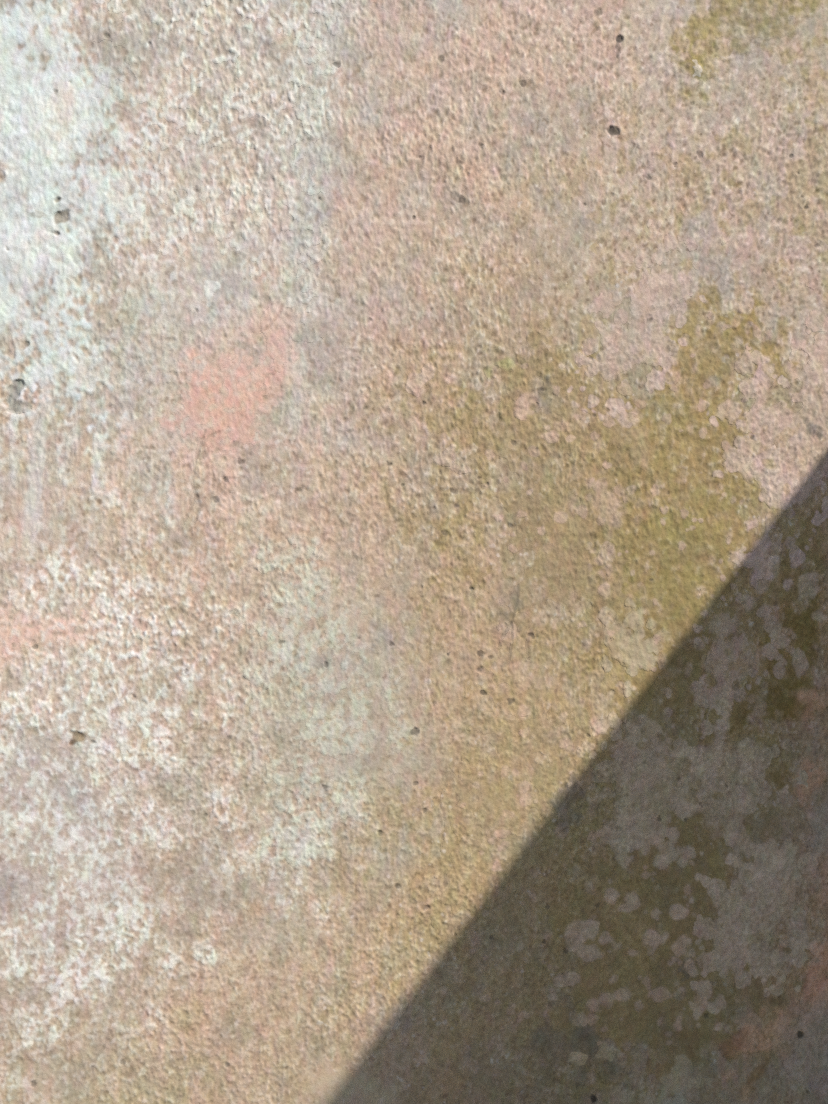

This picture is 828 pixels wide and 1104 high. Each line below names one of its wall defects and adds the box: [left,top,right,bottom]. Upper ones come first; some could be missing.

damp [802,417,826,439]
damp [547,773,586,833]
damp [781,994,828,1104]